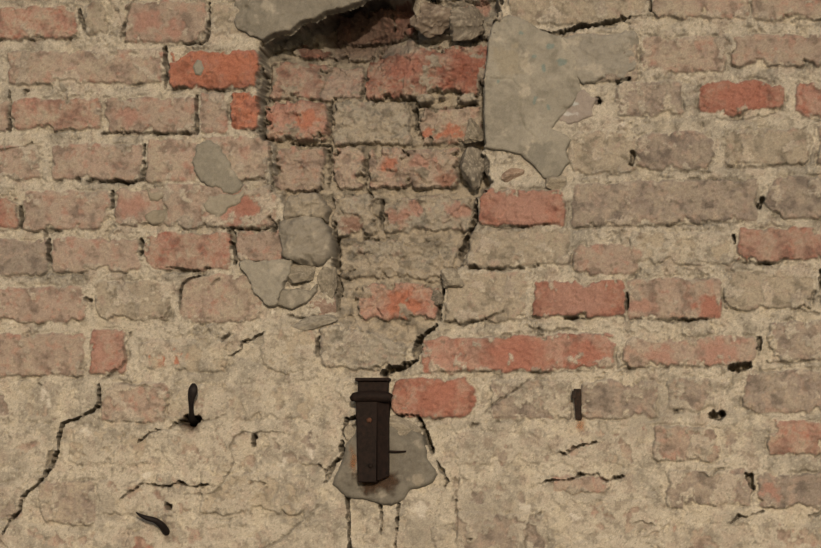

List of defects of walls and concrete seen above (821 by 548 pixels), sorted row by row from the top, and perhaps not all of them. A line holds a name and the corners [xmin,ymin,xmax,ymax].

crack [540,13,660,36]
spalling [259,0,502,348]
crack [456,198,479,262]
crack [380,287,445,378]
crack [0,331,165,548]
crack [120,413,289,499]
crack [396,412,461,548]
crack [538,440,625,485]
crack [377,503,402,548]